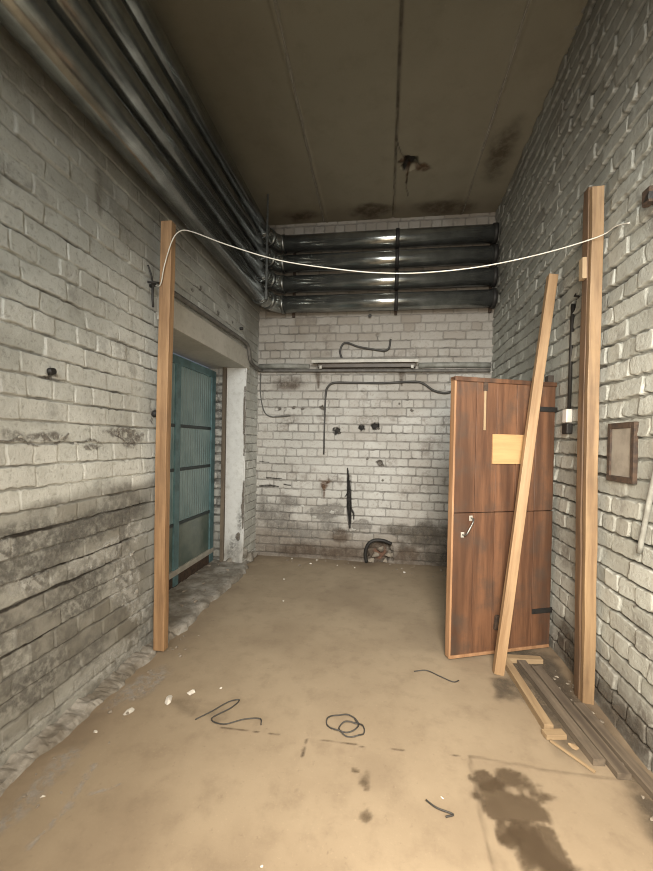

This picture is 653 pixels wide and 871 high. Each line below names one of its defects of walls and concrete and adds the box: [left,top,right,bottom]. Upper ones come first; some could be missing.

water stain [473,769,574,871]